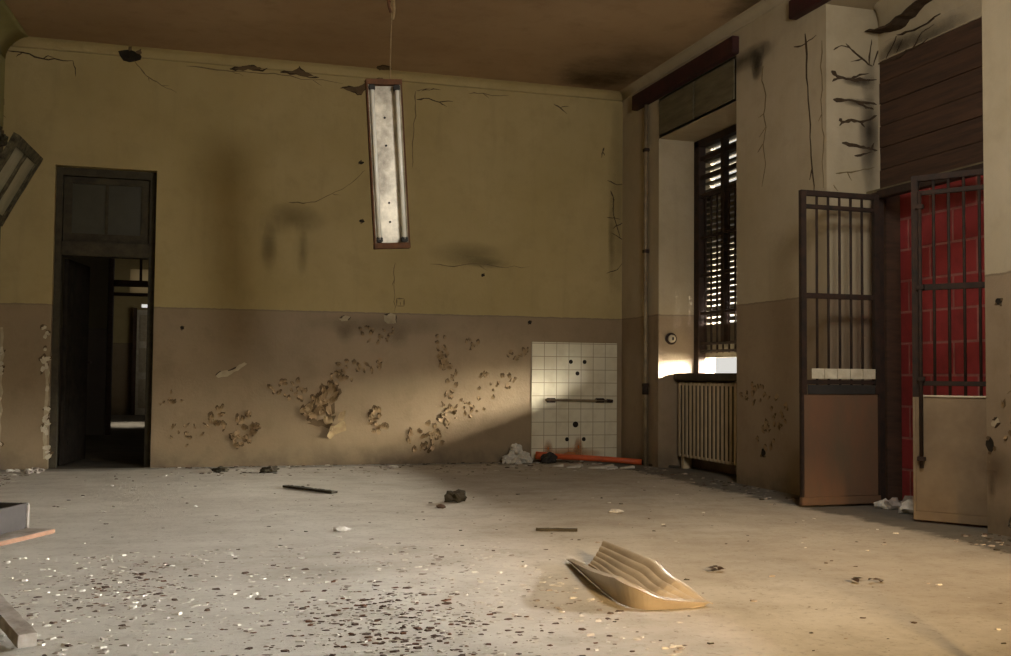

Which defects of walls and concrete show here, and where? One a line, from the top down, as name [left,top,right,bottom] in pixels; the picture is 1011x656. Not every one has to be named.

crack [10,51,76,76]
spalling [280,66,319,78]
spalling [342,83,365,95]
crack [794,24,934,191]
peeling [38,324,54,460]
peeling [267,357,382,439]
peeling [368,405,389,435]
peeling [406,334,517,454]